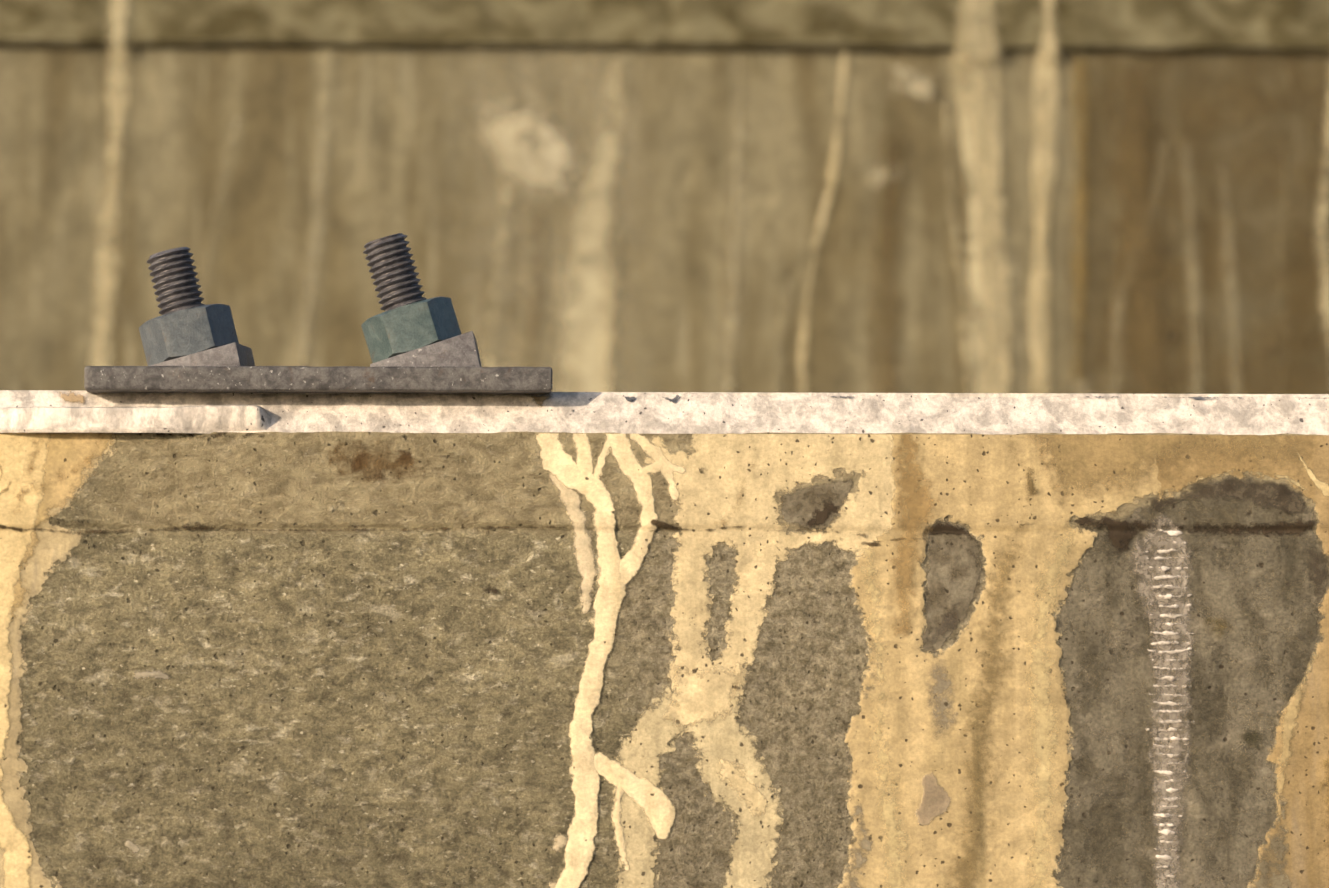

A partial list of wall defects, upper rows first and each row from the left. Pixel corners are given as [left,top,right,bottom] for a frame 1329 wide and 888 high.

damp [0,432,118,888]
damp [535,433,1329,888]